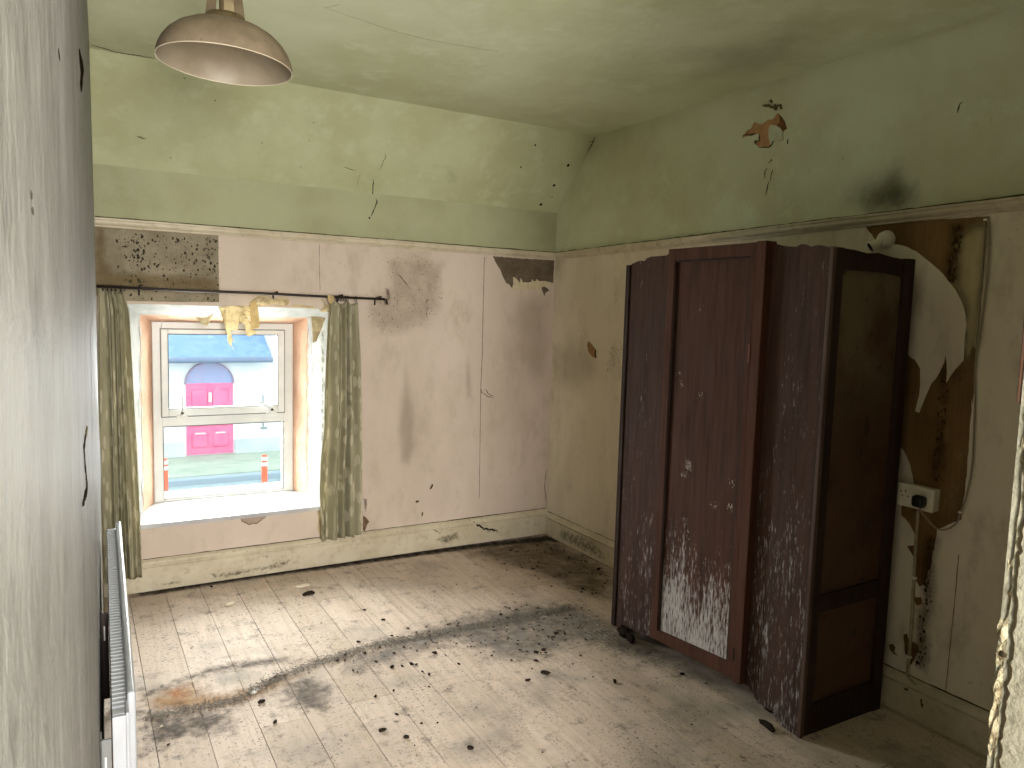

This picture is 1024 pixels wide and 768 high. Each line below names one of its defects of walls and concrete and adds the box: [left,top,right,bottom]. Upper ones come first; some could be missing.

spalling [743,99,787,148]
crack [345,156,386,219]
peeling [493,256,554,296]
peeling [866,216,990,667]
crack [81,426,89,507]
peeling [241,516,266,525]
leakage [889,634,919,665]